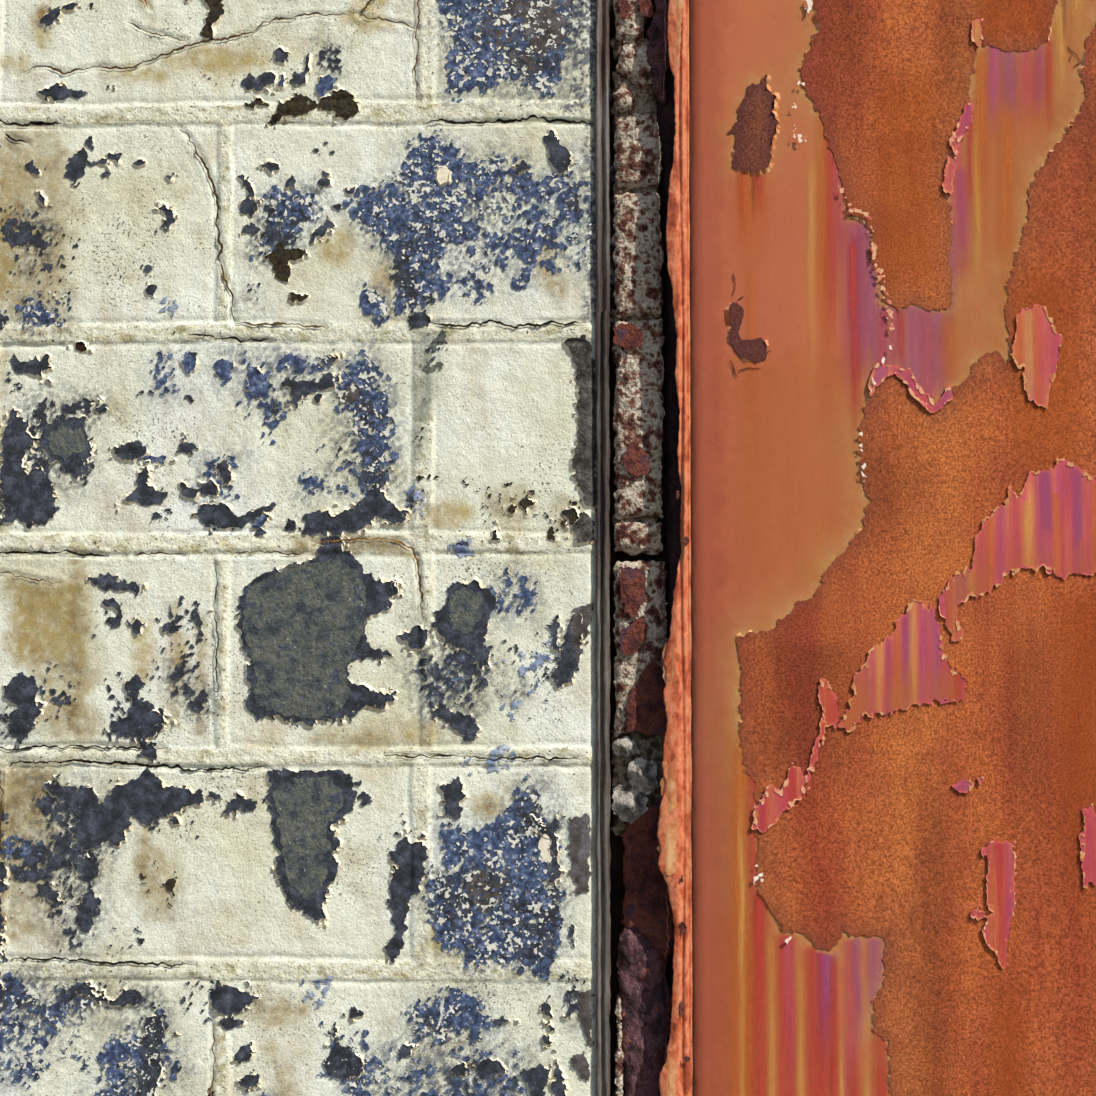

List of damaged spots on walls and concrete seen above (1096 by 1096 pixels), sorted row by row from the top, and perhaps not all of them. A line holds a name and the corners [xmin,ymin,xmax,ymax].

crack [15,0,420,98]
crack [179,129,325,343]
peeling [236,127,596,373]
crack [425,115,594,124]
peeling [438,0,584,104]
rust [849,224,873,396]
peeling [0,349,276,538]
peeling [213,334,597,742]
peeling [724,0,1096,1096]
peeling [0,572,372,1096]
peeling [317,744,595,1096]
rust [727,728,857,1096]